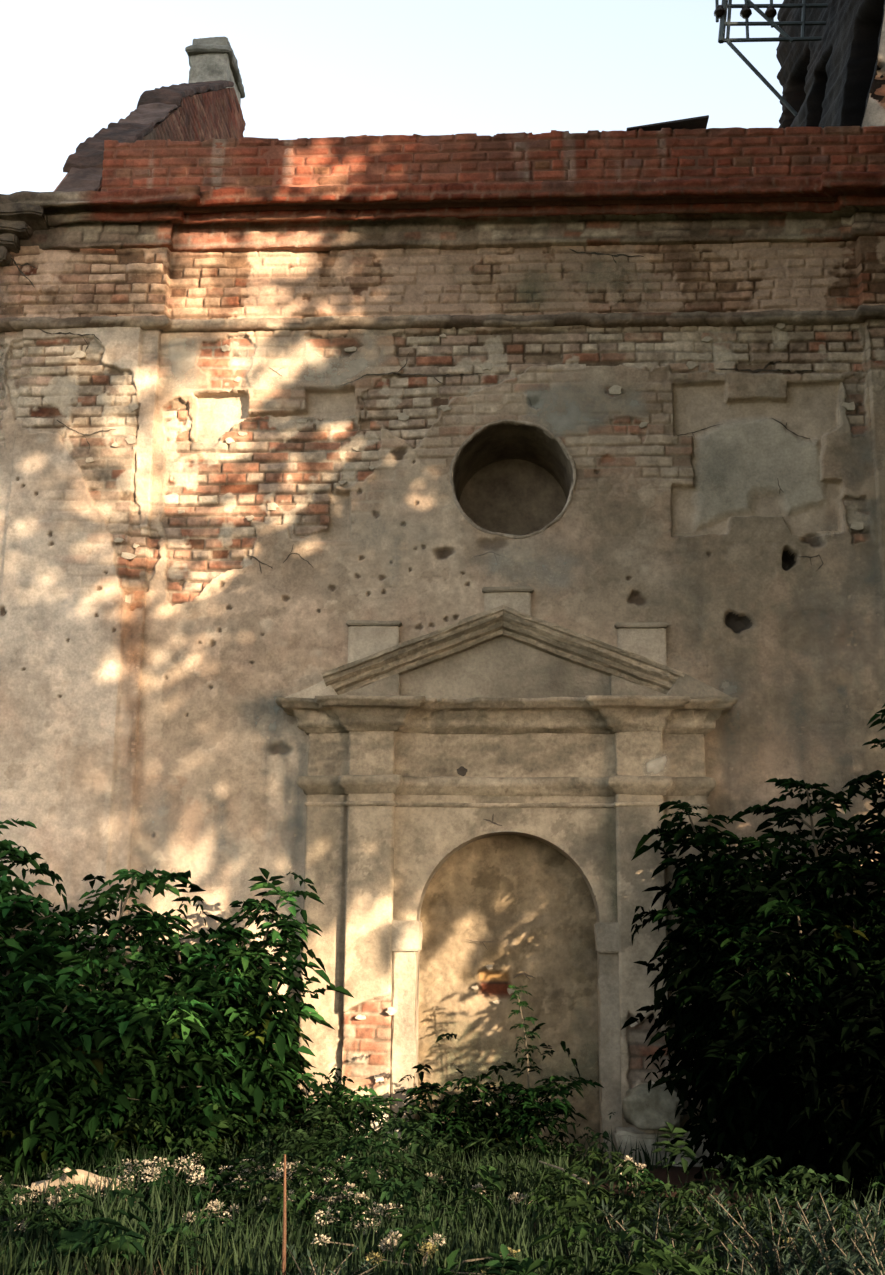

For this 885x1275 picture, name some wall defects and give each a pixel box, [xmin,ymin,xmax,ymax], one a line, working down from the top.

flaking render [0,320,885,611]
spalling [725,612,752,633]
flaking render [471,965,515,1005]
flaking render [341,994,397,1089]